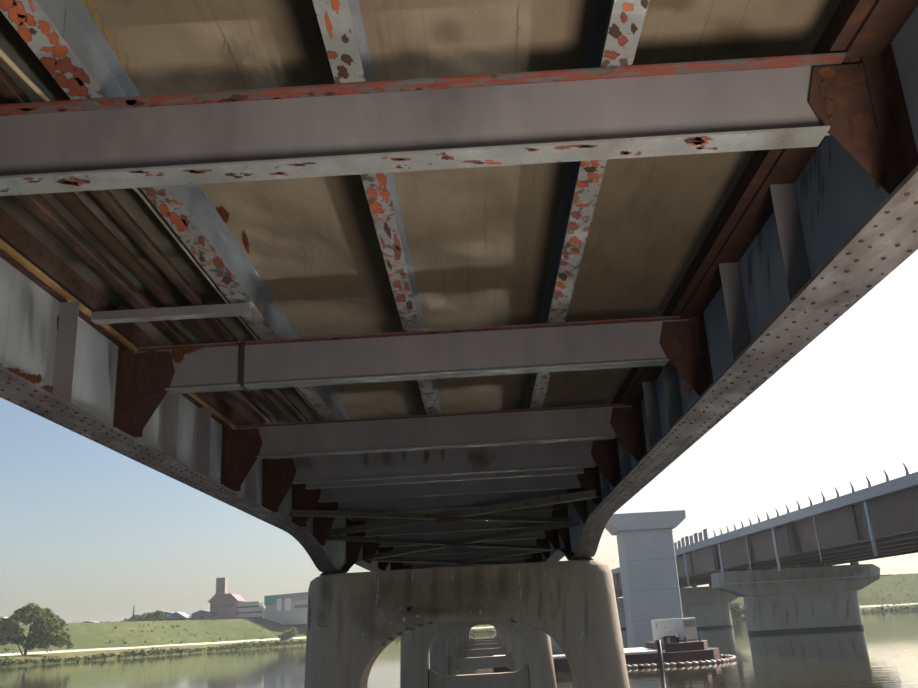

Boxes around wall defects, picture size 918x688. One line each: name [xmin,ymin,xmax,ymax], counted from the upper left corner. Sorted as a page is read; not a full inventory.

peeling [0,0,90,96]
peeling [325,0,353,79]
peeling [604,0,648,60]
peeling [146,188,190,232]
peeling [191,236,234,285]
peeling [366,173,413,310]
peeling [555,160,600,298]